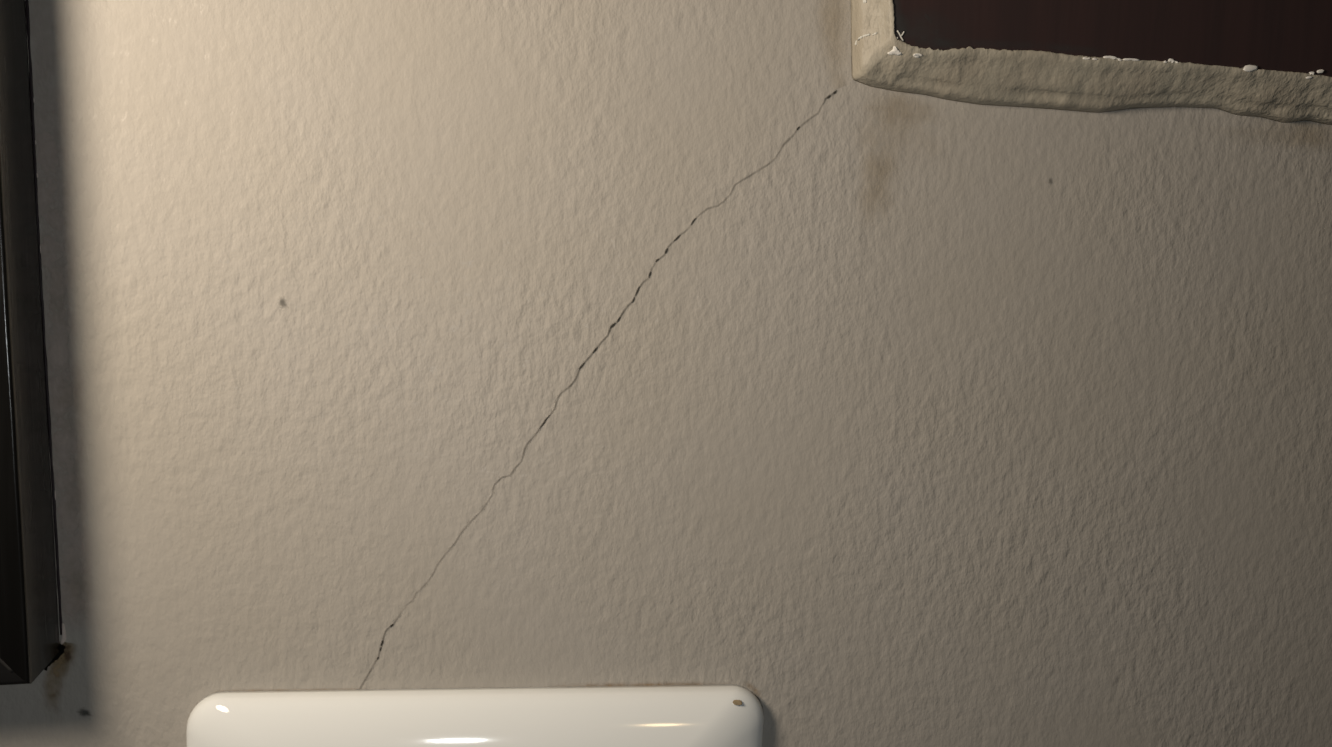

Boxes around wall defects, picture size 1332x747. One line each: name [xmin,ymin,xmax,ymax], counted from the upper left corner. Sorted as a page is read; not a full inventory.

crack [570,218,696,386]